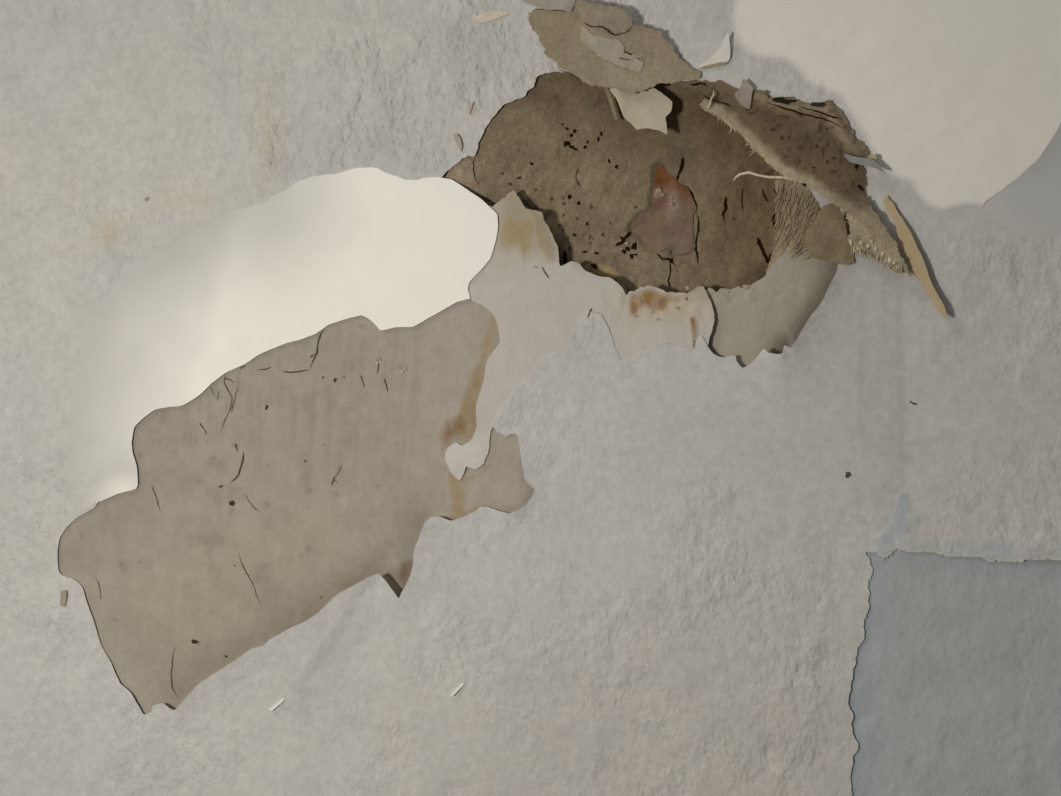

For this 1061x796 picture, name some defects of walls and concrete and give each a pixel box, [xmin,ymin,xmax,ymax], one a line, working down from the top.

peeling [574,0,644,72]
flaking render [58,72,838,714]